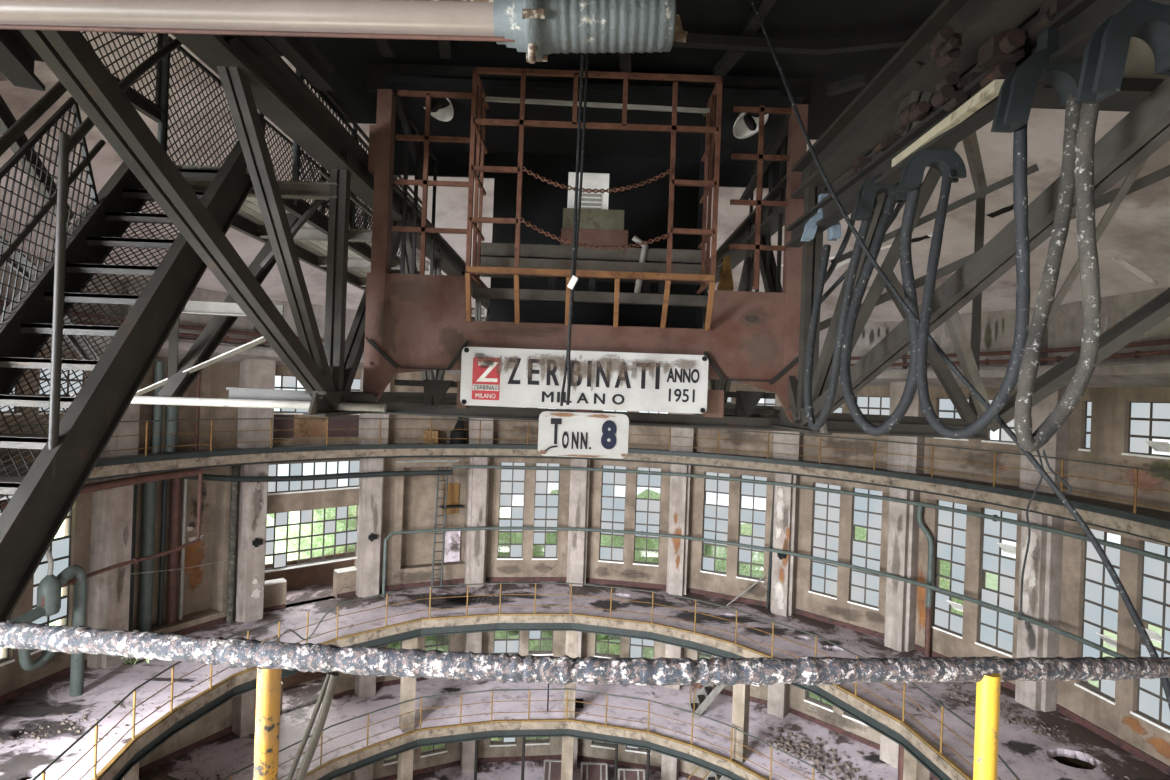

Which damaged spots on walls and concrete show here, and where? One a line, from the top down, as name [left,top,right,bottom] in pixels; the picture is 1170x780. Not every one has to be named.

corrosion [179,542,203,589]
corrosion [673,512,682,568]